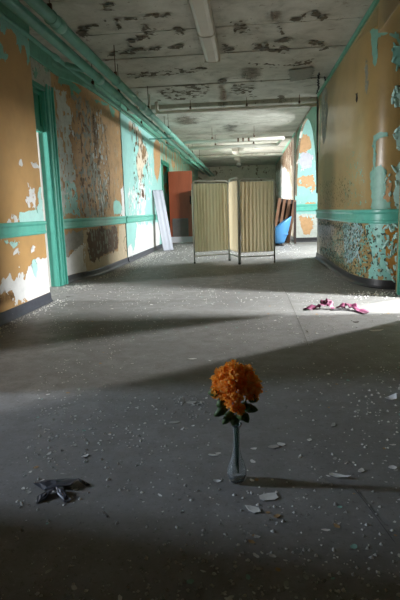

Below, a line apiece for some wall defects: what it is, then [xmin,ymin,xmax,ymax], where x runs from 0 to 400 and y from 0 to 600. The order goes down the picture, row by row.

peeling [364,28,400,94]
peeling [7,182,44,223]
peeling [54,77,161,276]
peeling [276,85,400,209]
peeling [0,245,50,306]
peeling [296,214,398,282]